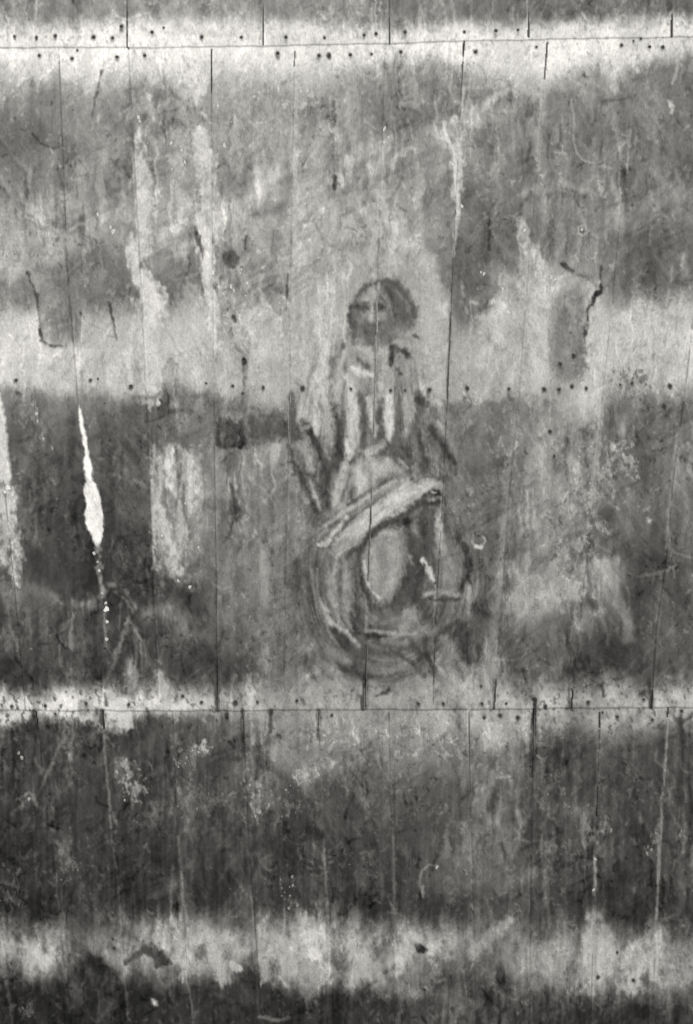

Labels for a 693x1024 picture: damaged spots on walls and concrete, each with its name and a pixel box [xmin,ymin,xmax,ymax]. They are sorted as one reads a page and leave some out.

leakage [0,6,693,195]
crack [25,269,72,350]
leakage [0,115,693,453]
crack [532,245,605,337]
peeling [38,404,211,687]
leakage [0,410,693,1024]